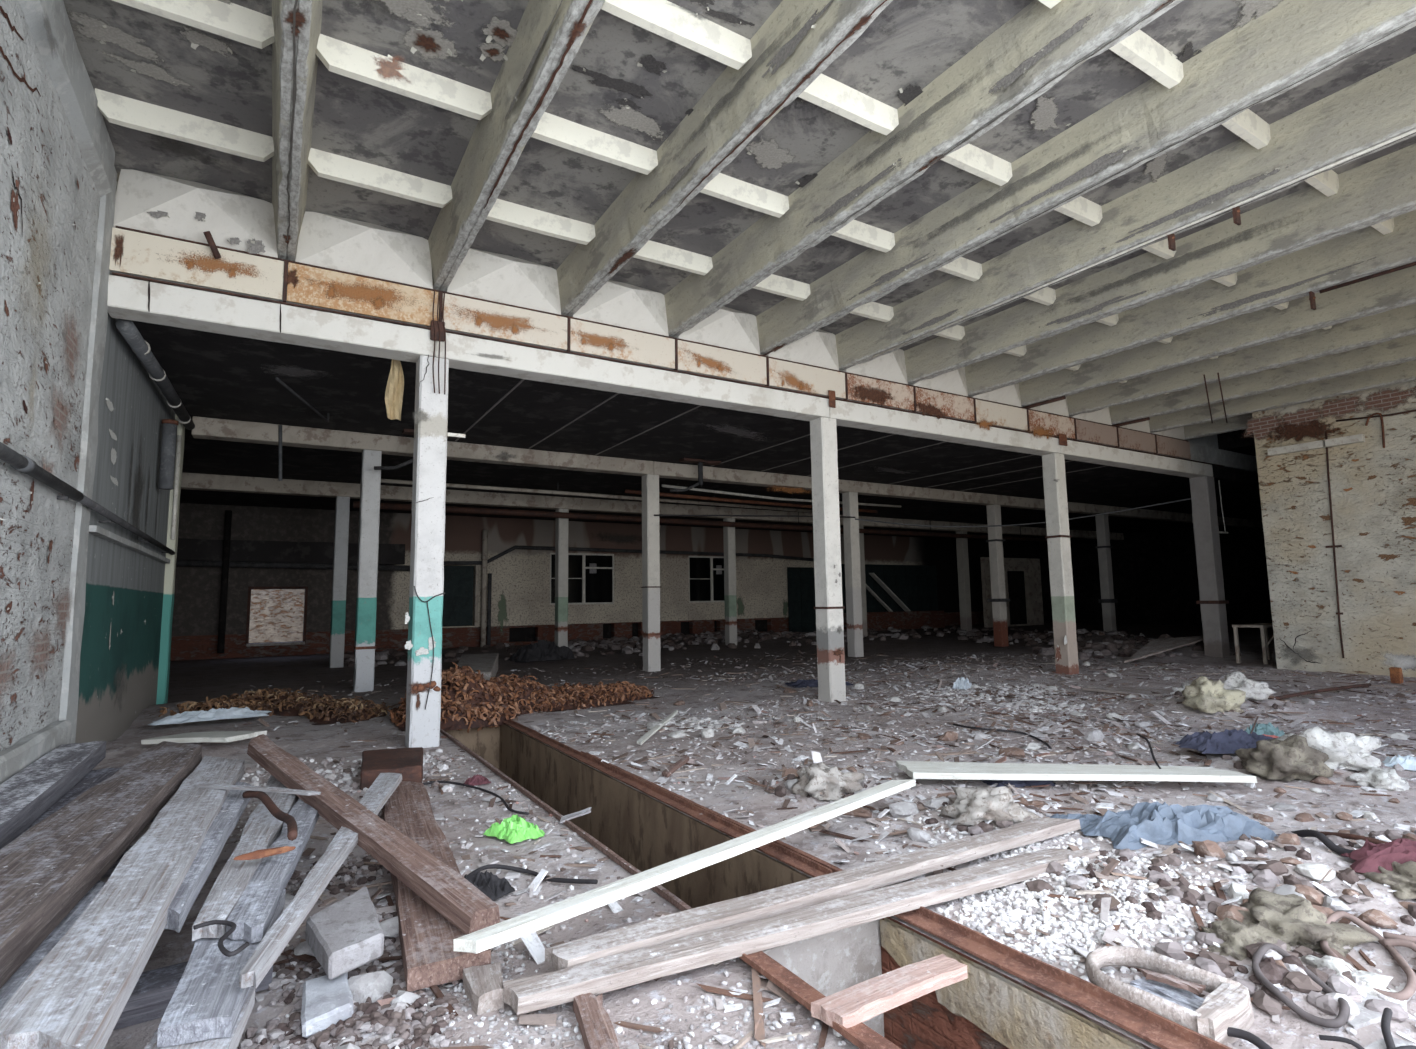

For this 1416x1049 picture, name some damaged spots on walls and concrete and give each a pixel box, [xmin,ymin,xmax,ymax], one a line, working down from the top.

spalling [403,14,458,60]
spalling [479,15,517,62]
corrosion [374,55,410,82]
peeling [10,190,20,232]
corrosion [172,252,258,278]
corrosion [287,269,416,311]
corrosion [454,306,545,334]
corrosion [563,329,629,351]
corrosion [916,403,947,419]
flaking render [1246,387,1416,440]
peeling [1401,498,1416,525]
peeling [405,612,436,656]